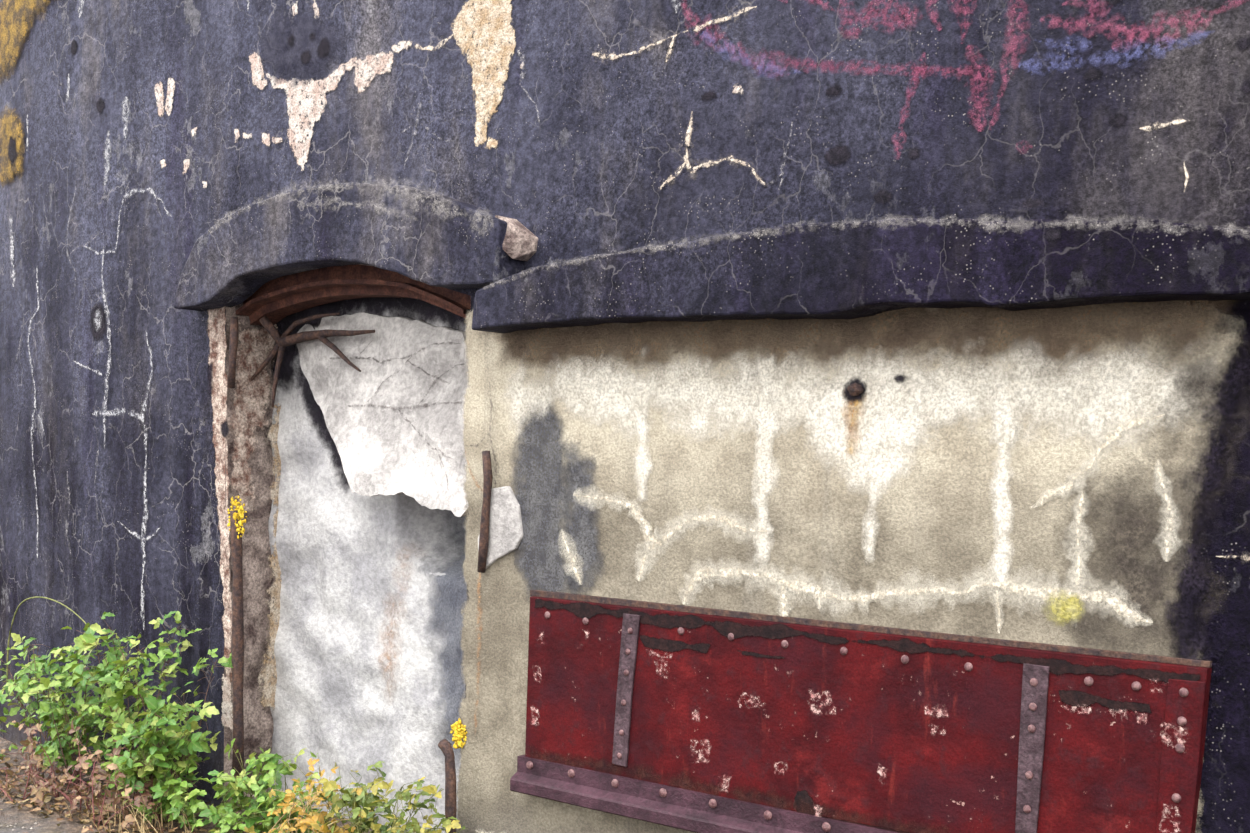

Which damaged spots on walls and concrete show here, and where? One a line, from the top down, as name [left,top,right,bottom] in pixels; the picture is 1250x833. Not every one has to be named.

peeling [234,41,409,171]
peeling [452,0,524,149]
crack [592,6,757,62]
crack [660,113,781,188]
crack [27,269,67,556]
crack [67,188,172,630]
damp [497,300,1250,661]
corrosion [534,599,1201,682]
corrosion [531,751,936,833]